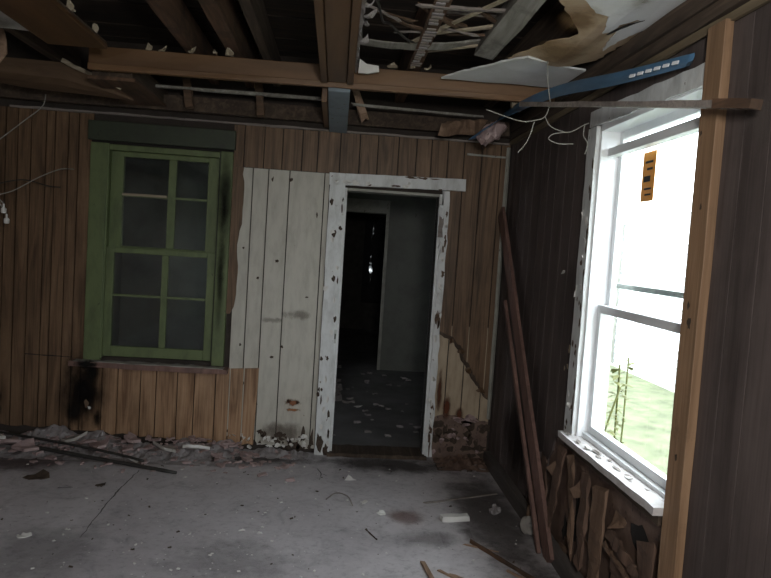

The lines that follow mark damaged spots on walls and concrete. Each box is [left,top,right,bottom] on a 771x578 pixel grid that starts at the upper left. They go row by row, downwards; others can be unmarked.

water stain [67,360,102,424]
spalling [426,398,490,460]